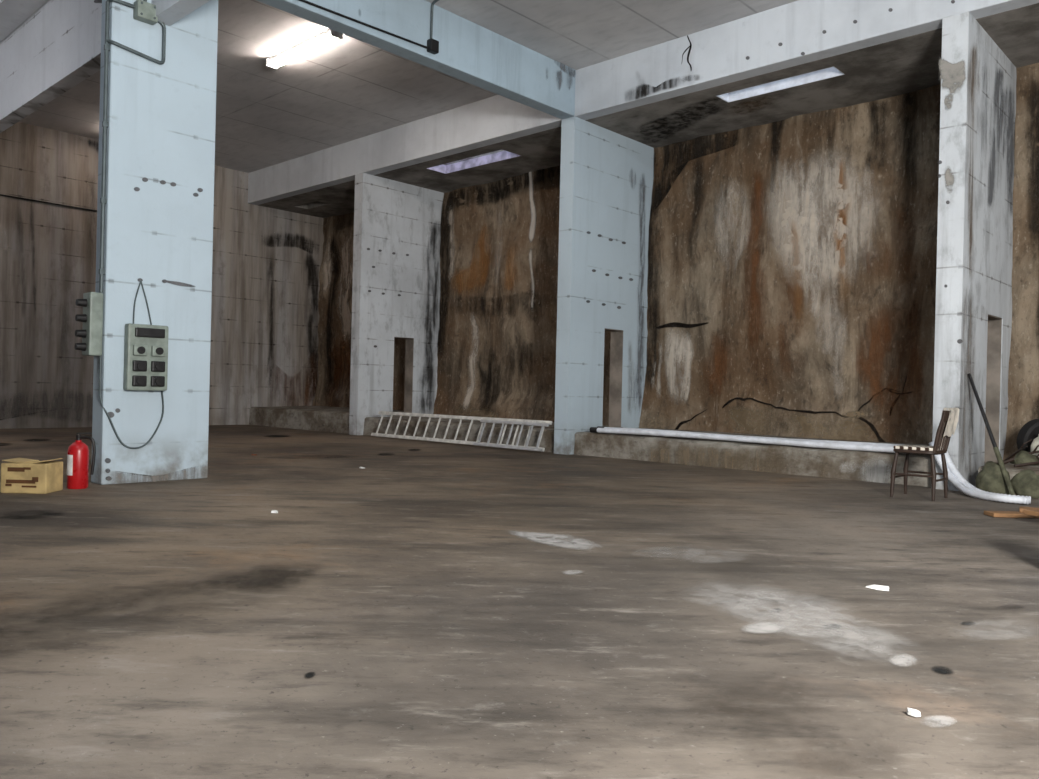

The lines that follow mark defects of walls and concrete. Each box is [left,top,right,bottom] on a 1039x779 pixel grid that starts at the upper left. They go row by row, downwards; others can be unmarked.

crack [681,35,692,71]
peeling [939,59,965,109]
corrosion [838,168,846,261]
peeling [938,160,954,204]
damp [988,70,1014,211]
damp [1028,84,1039,237]
corrosion [747,179,764,344]
damp [267,234,353,396]
crack [657,321,708,329]
crack [675,376,912,442]